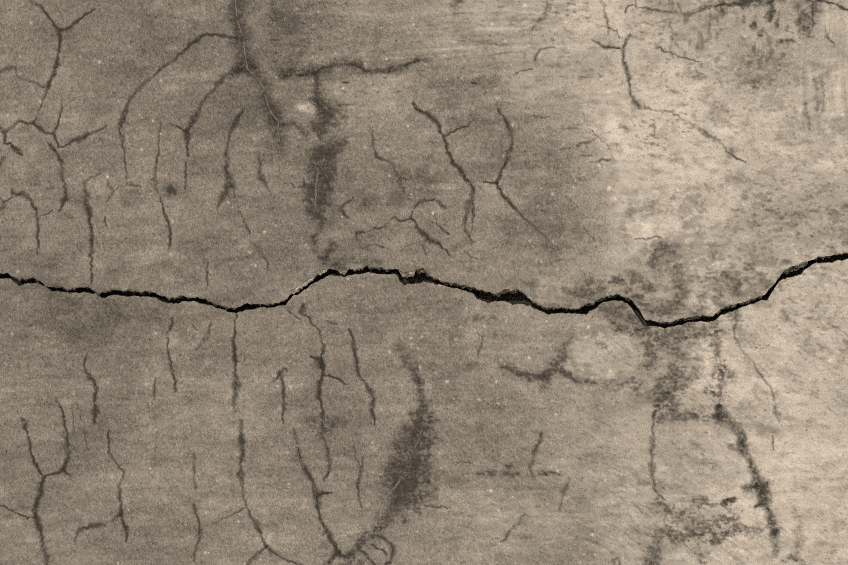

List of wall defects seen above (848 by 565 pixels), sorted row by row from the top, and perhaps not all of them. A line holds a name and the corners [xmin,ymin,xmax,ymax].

damp [304,78,347,226]
crack [0,5,848,426]
crack [3,406,70,560]
crack [83,358,128,542]
crack [237,422,245,487]
crack [249,526,296,564]
crack [297,448,394,565]
damp [348,374,436,556]
crack [739,440,779,535]